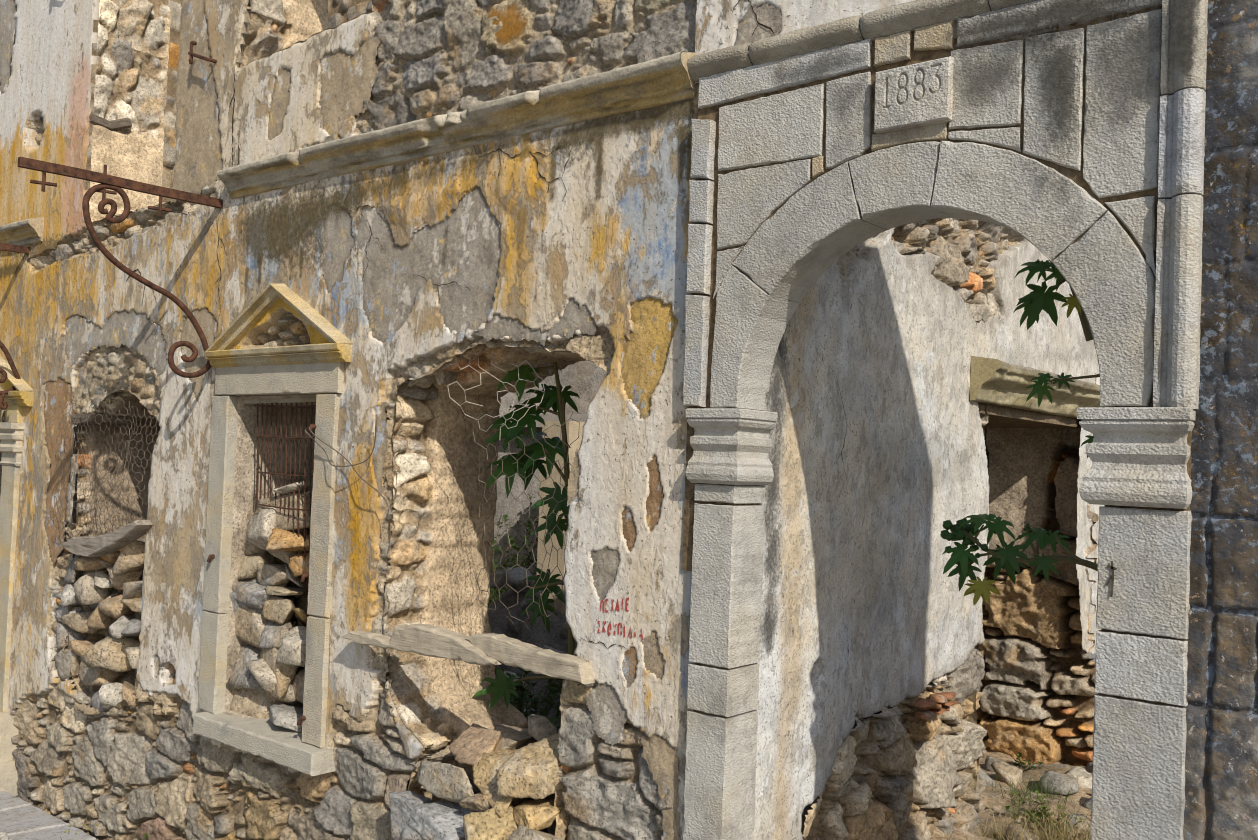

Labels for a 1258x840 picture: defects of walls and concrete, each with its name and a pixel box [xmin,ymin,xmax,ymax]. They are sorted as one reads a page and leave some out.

flaking render [0,0,16,94]
flaking render [30,0,222,271]
flaking render [302,0,697,149]
crack [473,145,572,201]
crack [733,0,775,36]
flaking render [11,187,681,840]